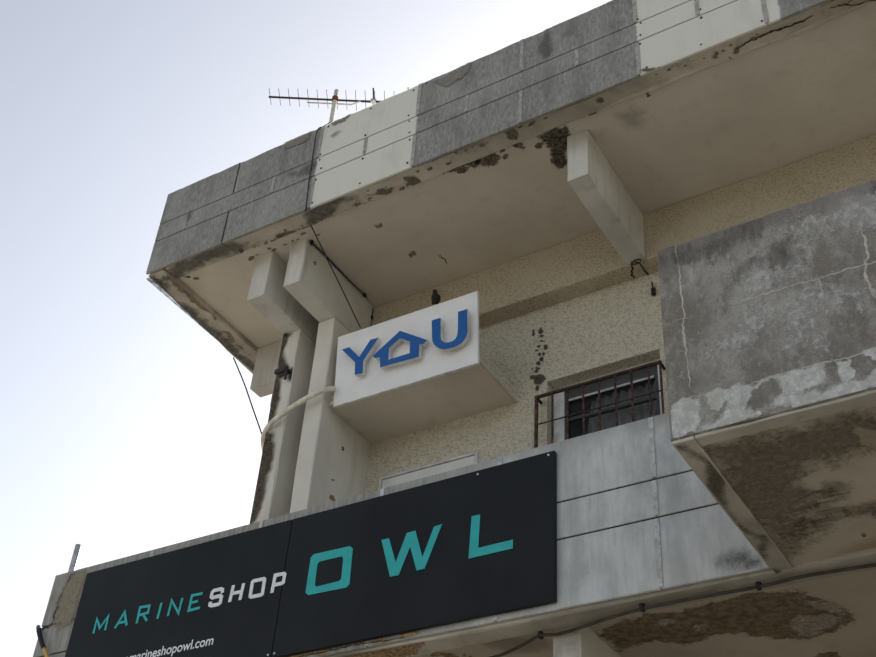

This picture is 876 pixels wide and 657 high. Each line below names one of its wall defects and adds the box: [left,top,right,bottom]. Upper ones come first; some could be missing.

crack [734,0,875,54]
spalling [444,117,571,174]
spalling [239,209,335,261]
leakage [305,199,344,225]
spalling [353,161,434,207]
crack [725,228,876,315]
leakage [146,243,255,371]
crack [674,245,723,404]
peeling [671,347,876,438]
crack [744,353,862,386]
leakage [676,413,876,558]
peeling [596,589,855,652]